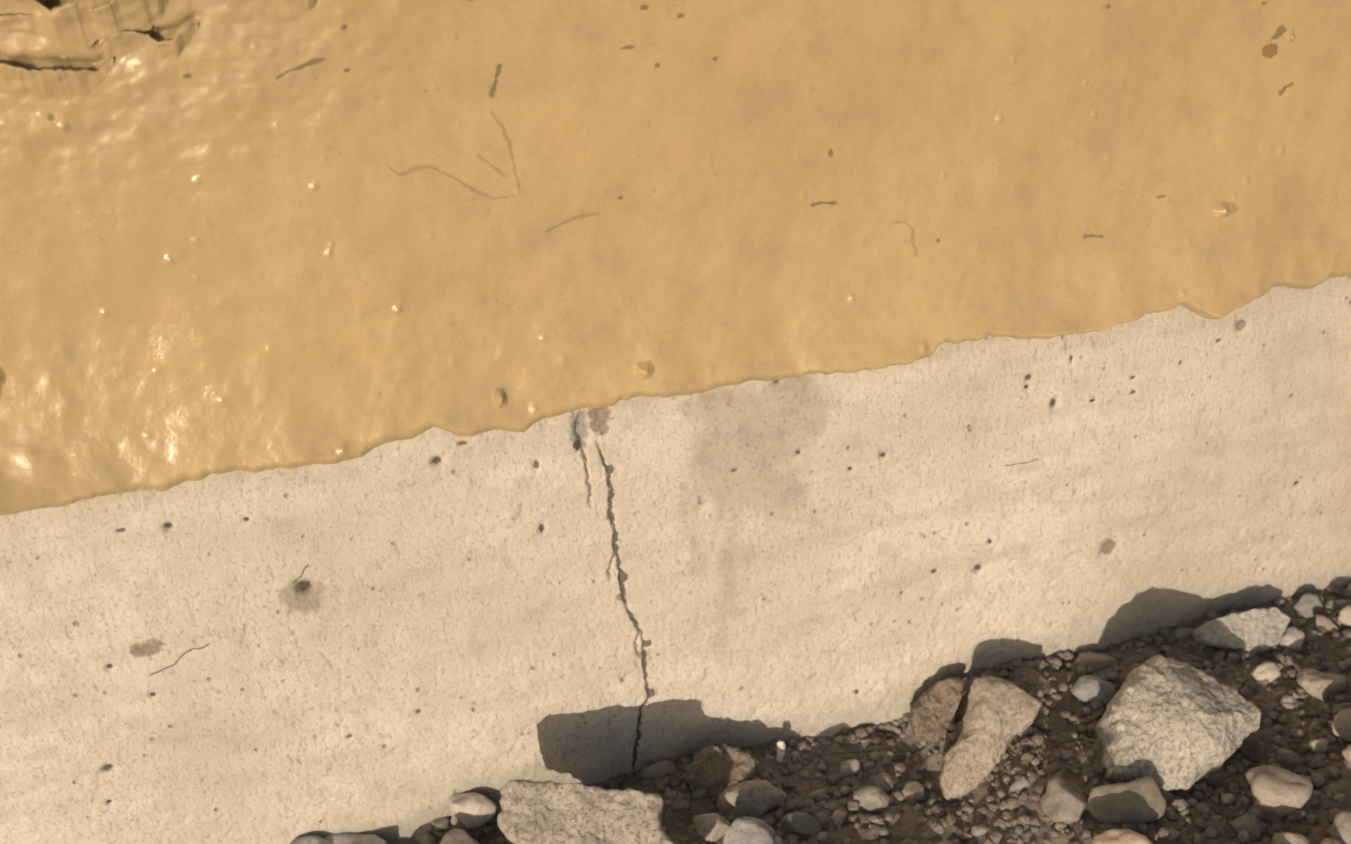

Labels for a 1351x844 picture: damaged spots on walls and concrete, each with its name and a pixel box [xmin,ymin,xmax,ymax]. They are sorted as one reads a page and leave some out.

spalling [571,407,609,450]
spalling [1102,539,1115,554]
crack [576,419,655,768]
spalling [130,642,160,656]